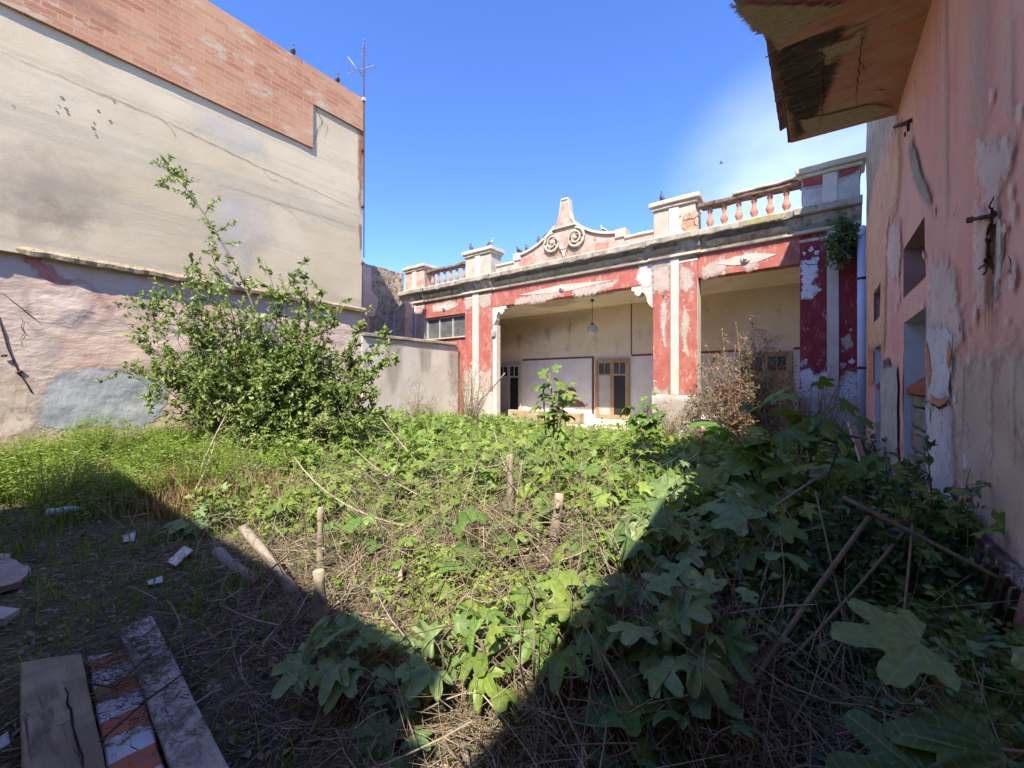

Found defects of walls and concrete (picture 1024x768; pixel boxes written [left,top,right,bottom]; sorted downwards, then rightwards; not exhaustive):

crack [3,52,358,222]
leakage [771,27,848,139]
peeling [514,280,617,305]
peeling [635,254,727,357]
spalling [679,210,702,231]
peeling [797,104,933,398]
peeling [921,103,1022,503]
crack [57,687,84,767]